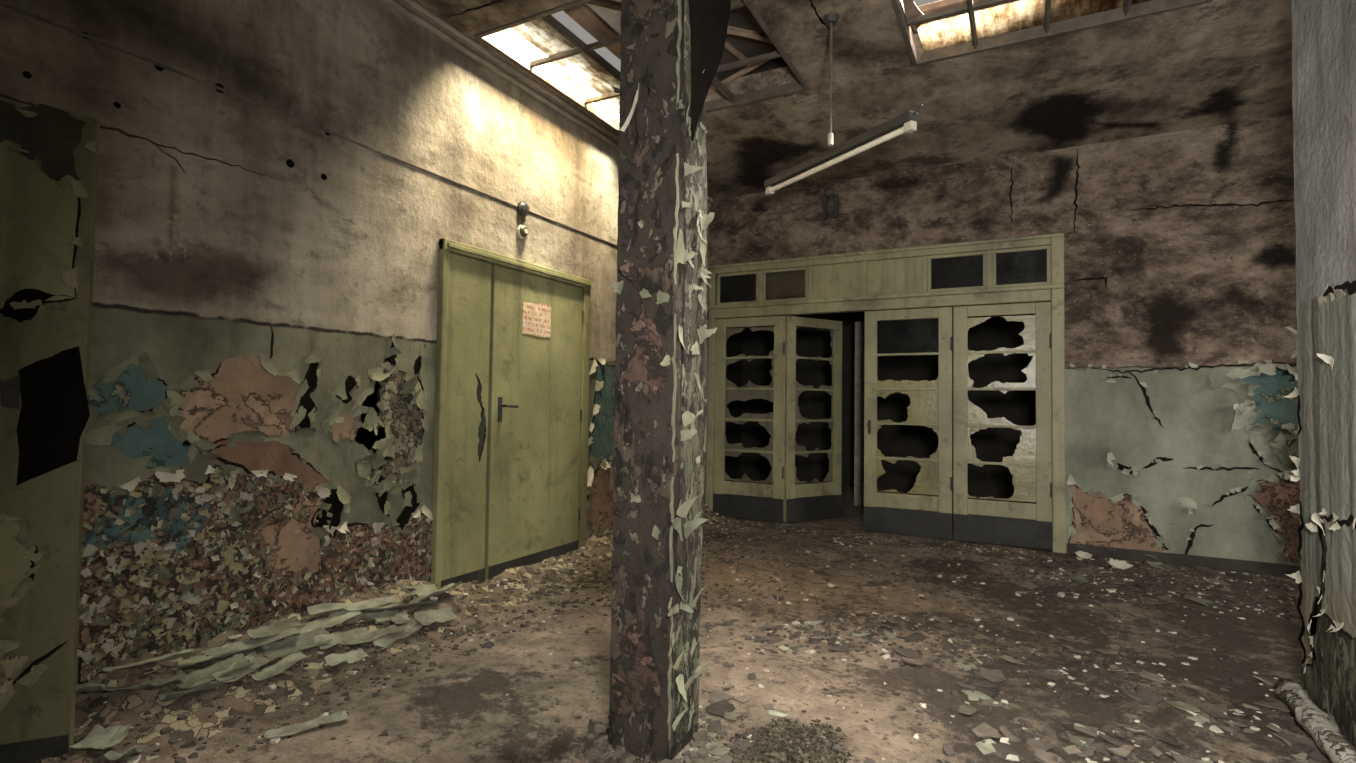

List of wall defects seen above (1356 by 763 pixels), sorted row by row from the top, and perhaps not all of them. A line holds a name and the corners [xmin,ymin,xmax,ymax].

peeling [0,100,97,323]
damp [1040,157,1073,203]
crack [1132,199,1294,211]
damp [1213,123,1237,171]
peeling [1317,281,1356,307]
peeling [77,334,435,684]
crack [1103,372,1294,555]
peeling [1066,327,1356,748]